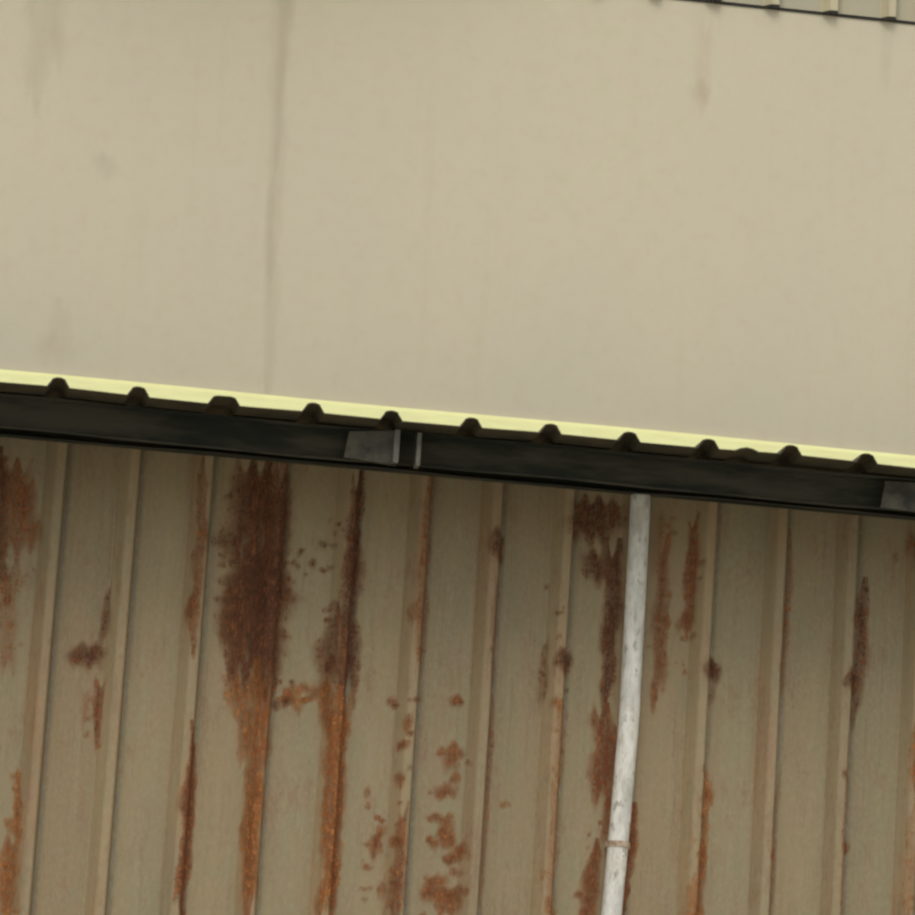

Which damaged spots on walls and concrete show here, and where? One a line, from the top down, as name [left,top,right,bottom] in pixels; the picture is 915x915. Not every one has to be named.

corrosion [69,645,105,668]
corrosion [83,679,105,748]
corrosion [223,470,366,915]
corrosion [570,493,628,915]
corrosion [651,517,678,709]
corrosion [681,514,703,641]
corrosion [843,576,870,725]
corrosion [0,769,23,915]
corrosion [172,719,198,915]
corrosion [360,790,410,915]
corrosion [422,812,469,915]